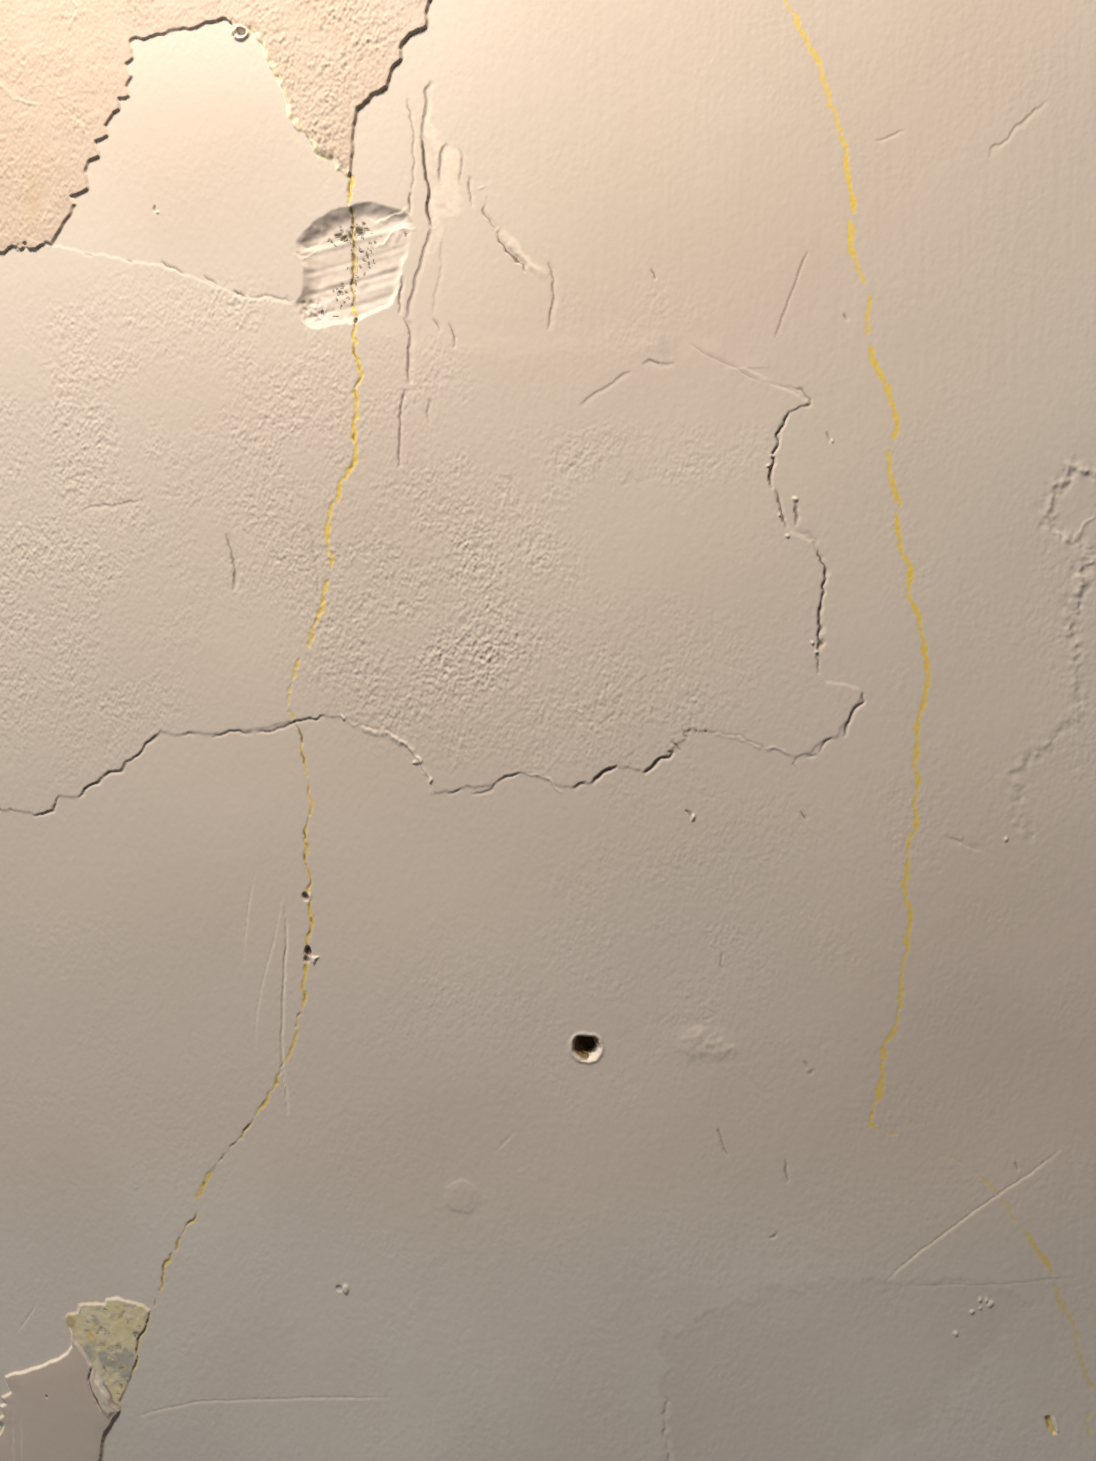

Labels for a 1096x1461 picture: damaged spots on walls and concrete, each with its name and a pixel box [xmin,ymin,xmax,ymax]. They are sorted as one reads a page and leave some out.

peeling [0,0,432,254]
flaking render [294,201,418,330]
crack [396,79,556,469]
crack [766,385,829,676]
crack [782,0,932,1138]
crack [0,173,364,1308]
crack [447,771,521,796]
crack [572,727,709,792]
peeling [0,1295,153,1461]
crack [940,1154,1096,1461]